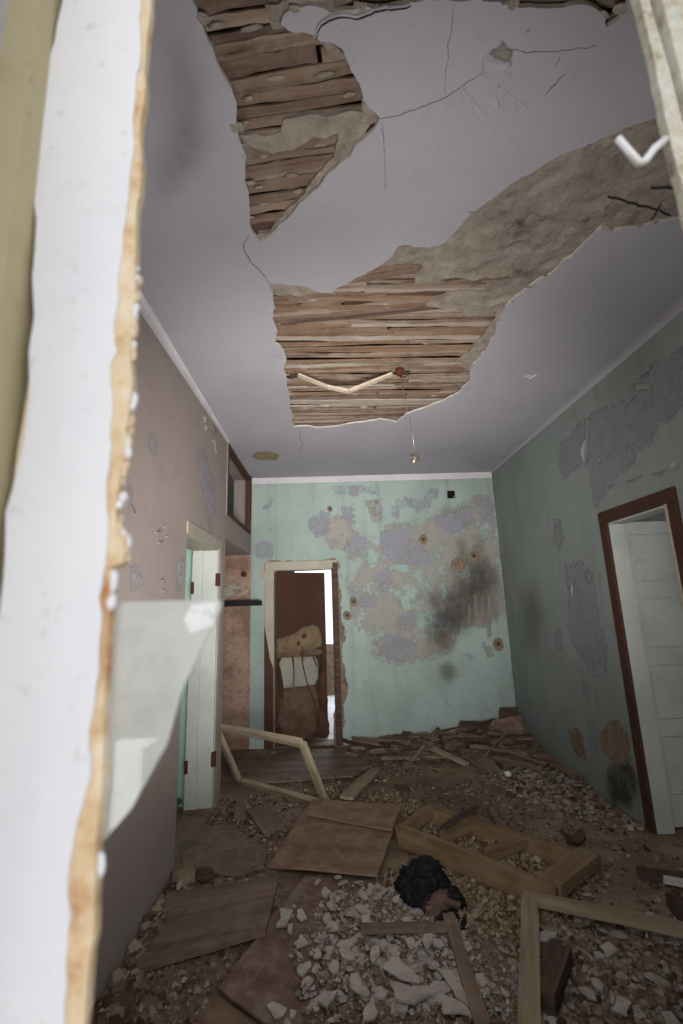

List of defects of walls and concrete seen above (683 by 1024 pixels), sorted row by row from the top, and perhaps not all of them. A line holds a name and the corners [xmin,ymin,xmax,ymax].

spalling [195,0,411,238]
crack [381,11,596,189]
spalling [505,0,573,11]
spalling [586,0,628,23]
spalling [270,117,680,426]
peeling [308,485,506,747]
water stain [438,566,497,642]